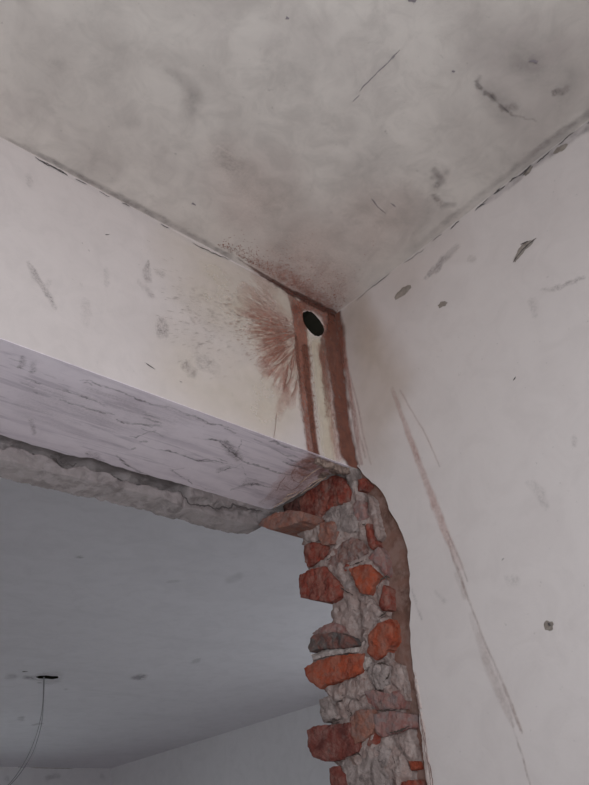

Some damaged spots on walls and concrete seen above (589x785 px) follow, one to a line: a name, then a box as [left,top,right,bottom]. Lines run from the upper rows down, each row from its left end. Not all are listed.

corrosion [226,269,358,508]
spalling [0,435,433,785]